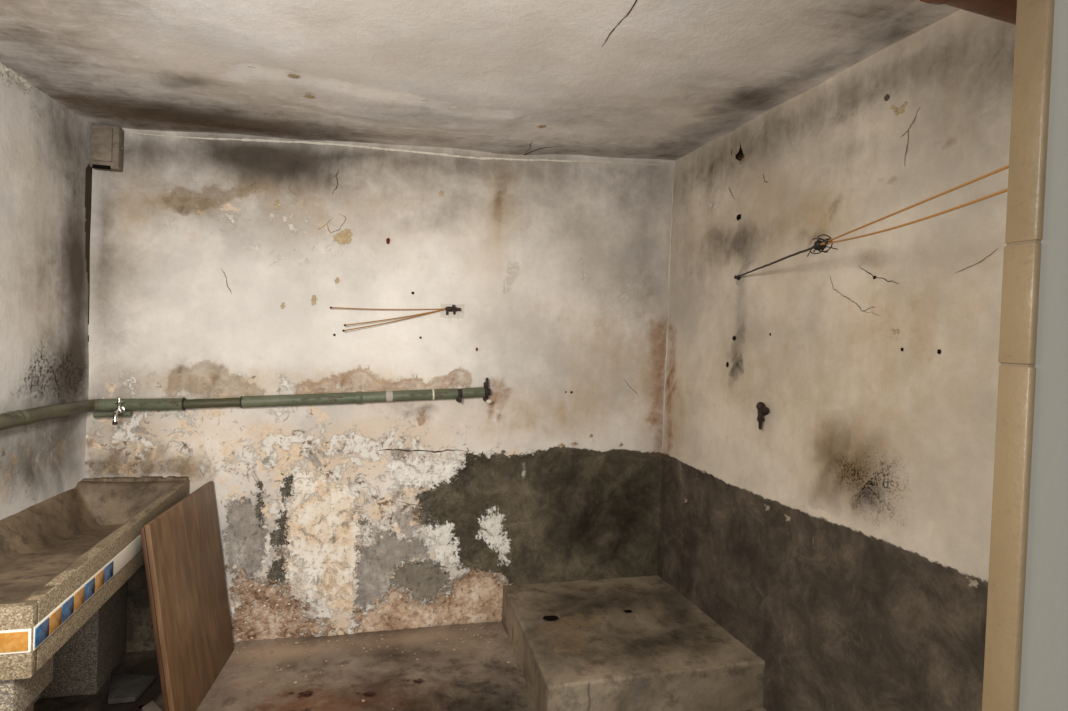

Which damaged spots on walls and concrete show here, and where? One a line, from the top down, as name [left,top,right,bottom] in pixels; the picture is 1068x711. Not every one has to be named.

crack [603,0,637,45]
crack [830,276,880,316]
damp [24,349,83,398]
damp [840,459,892,510]
peeling [222,455,514,643]